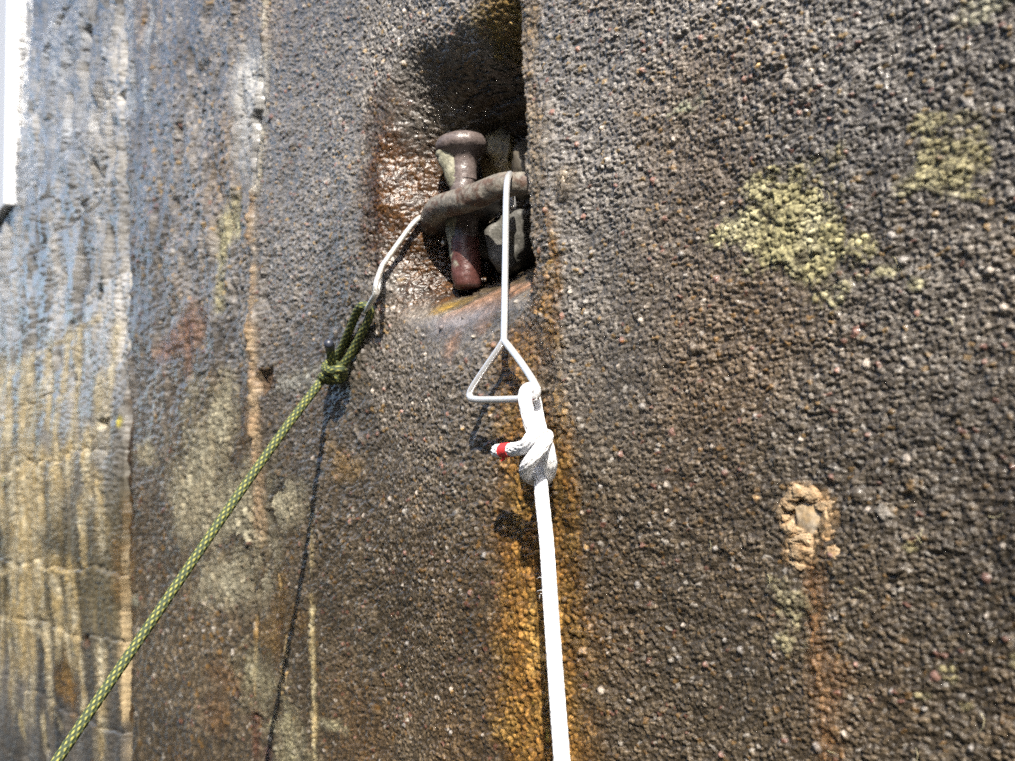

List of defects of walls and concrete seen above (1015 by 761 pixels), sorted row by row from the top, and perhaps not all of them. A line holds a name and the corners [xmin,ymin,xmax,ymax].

water stain [44,23,72,86]
water stain [57,113,90,161]
water stain [220,51,269,266]
water stain [0,325,103,709]
spalling [779,483,840,571]
rust [500,453,554,761]
rust [548,438,582,758]
water stain [97,643,105,690]
water stain [119,608,133,720]